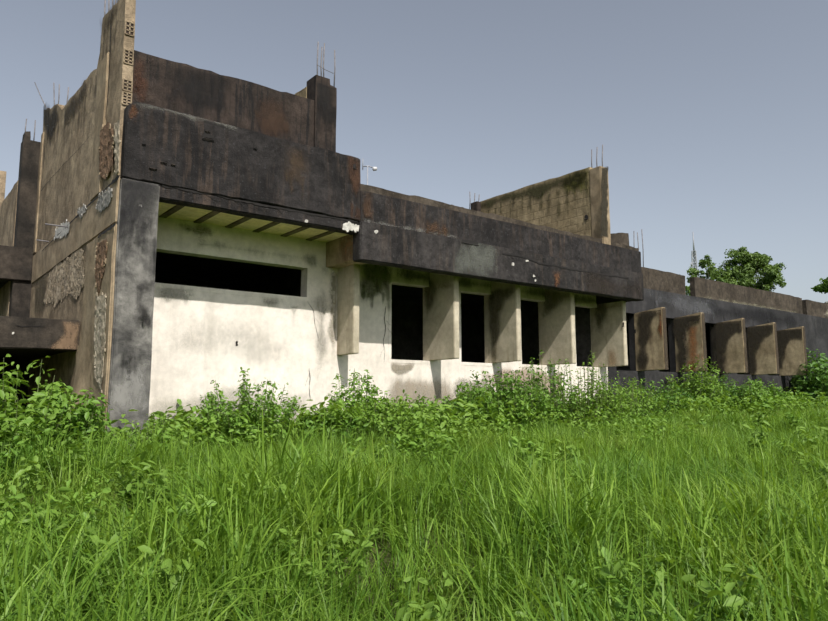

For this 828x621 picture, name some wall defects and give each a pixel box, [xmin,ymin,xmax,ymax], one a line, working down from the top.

flaking render [77,119,121,219]
damp [482,171,588,214]
peeling [36,219,70,242]
flaking render [43,248,85,308]
flaking render [93,240,108,393]
damp [113,370,146,409]
damp [391,364,560,410]